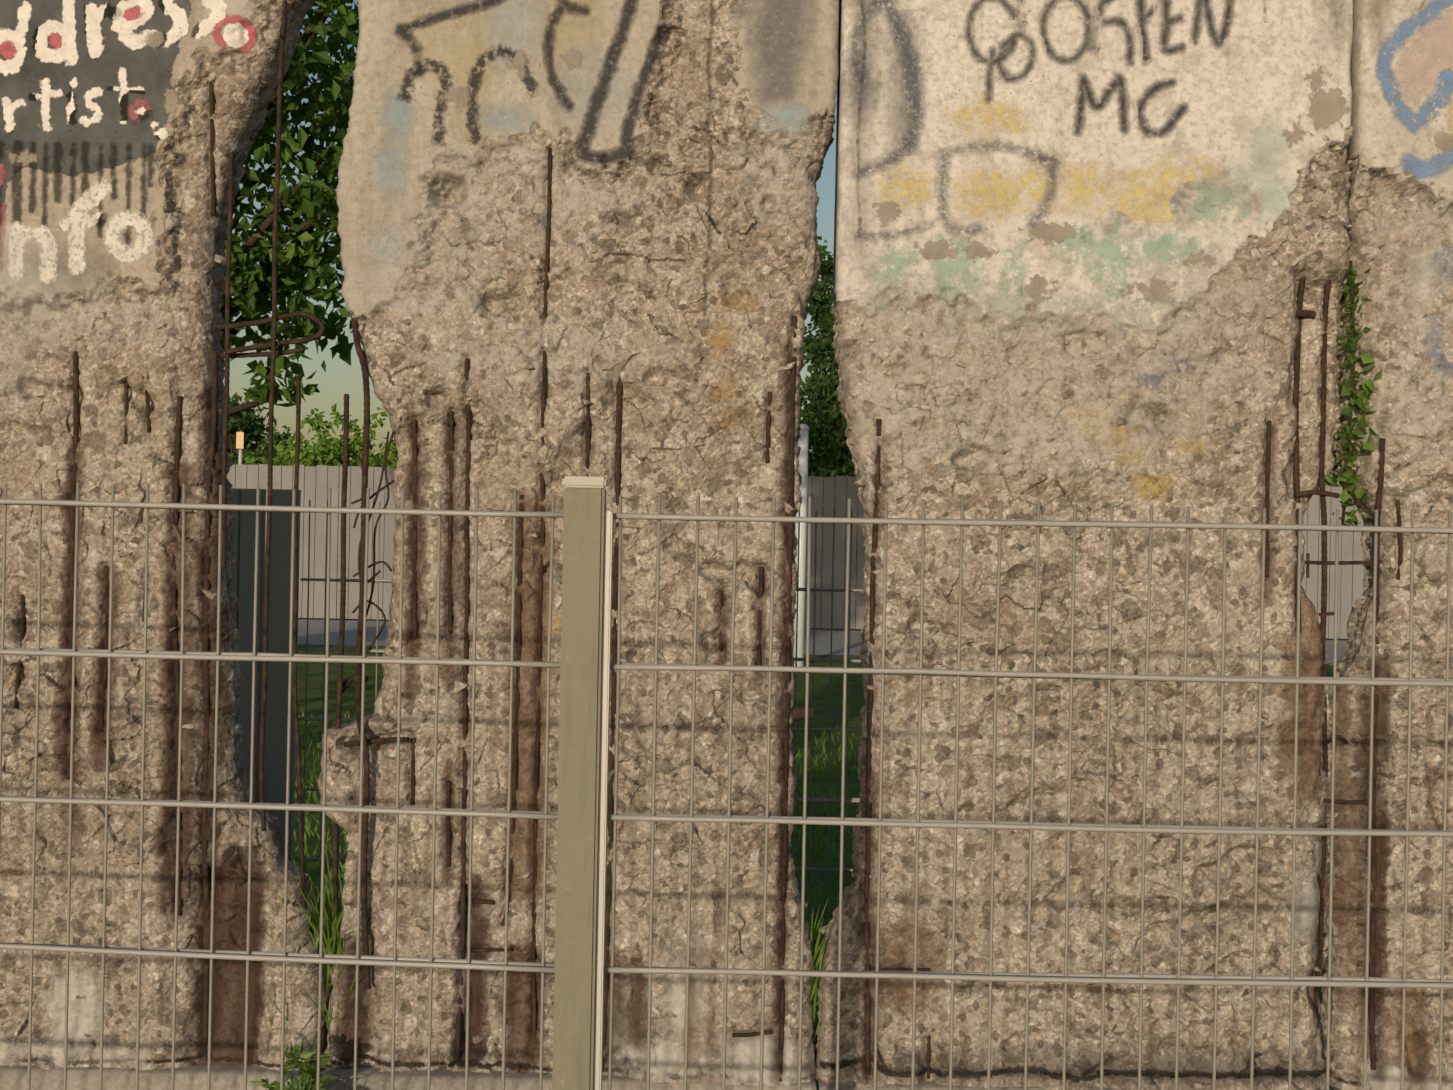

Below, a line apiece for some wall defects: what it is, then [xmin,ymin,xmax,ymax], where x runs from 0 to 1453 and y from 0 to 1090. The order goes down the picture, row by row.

corrosion [65,453,80,541]
spalling [0,0,325,1070]
corrosion [406,428,421,696]
corrosion [782,348,790,563]
spalling [318,0,1453,1090]
corrosion [57,579,79,772]
corrosion [92,571,113,770]
corrosion [162,389,262,1066]
spalling [251,961,554,1074]
corrosion [460,879,484,1067]
corrosion [508,946,537,1073]
corrosion [775,904,786,1078]